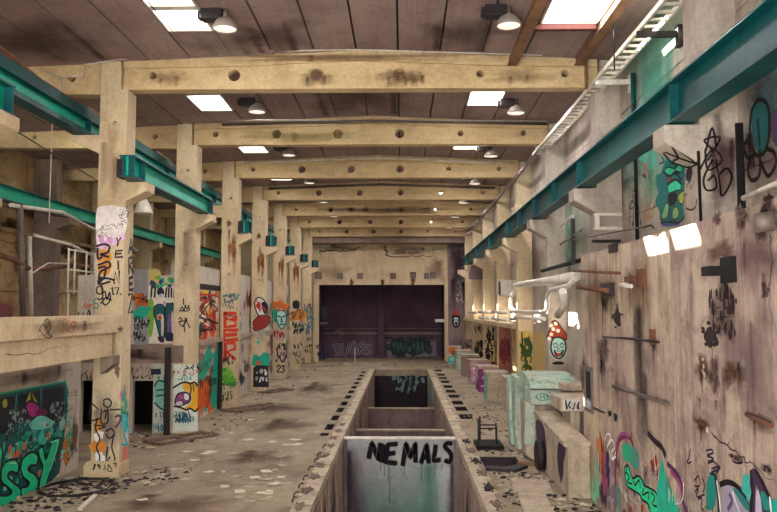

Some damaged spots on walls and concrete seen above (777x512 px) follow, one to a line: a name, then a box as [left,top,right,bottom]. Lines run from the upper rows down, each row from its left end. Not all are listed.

damp [307,72,325,83]
damp [388,74,423,83]
corrosion [227,220,235,257]
crack [319,246,364,257]
crack [383,246,445,257]
crack [711,431,776,483]